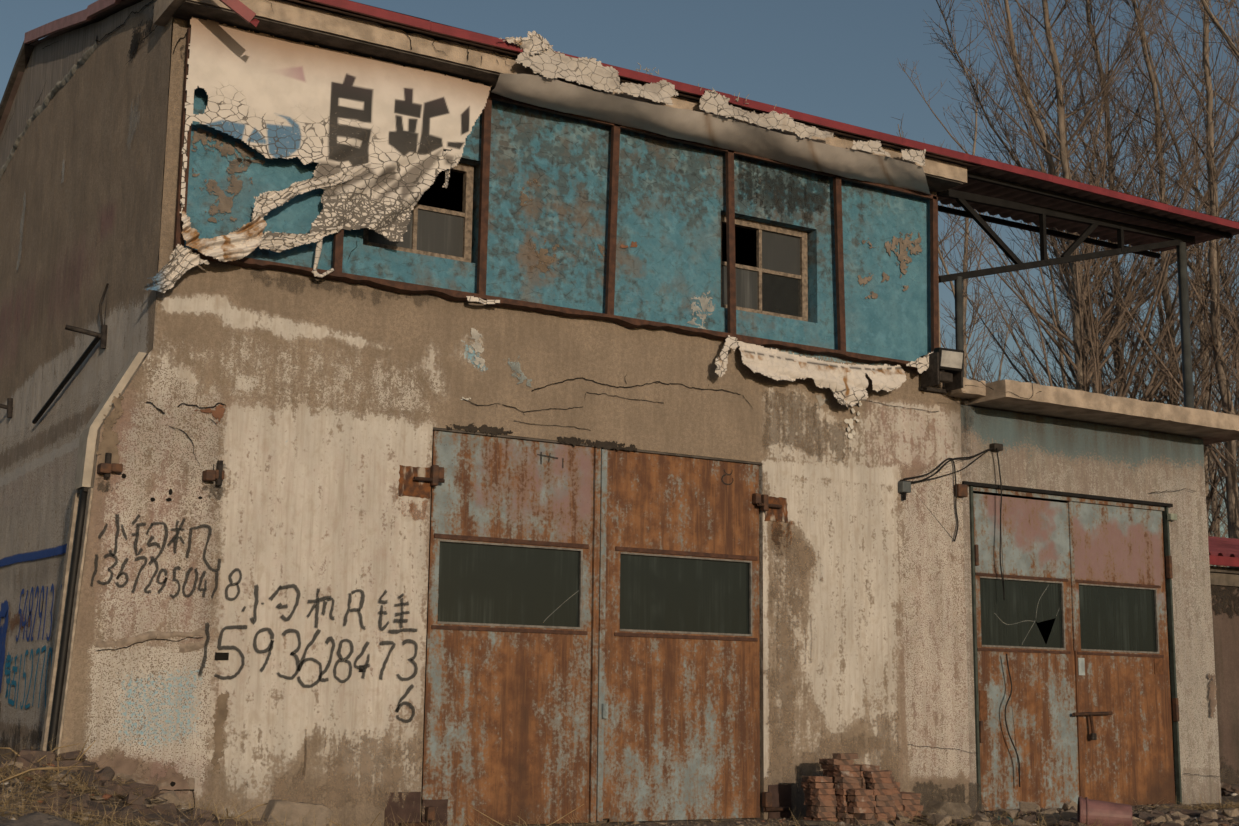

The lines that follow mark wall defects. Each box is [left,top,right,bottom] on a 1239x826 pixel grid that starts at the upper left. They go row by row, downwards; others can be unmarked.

crack [95,0,187,67]
peeling [191,128,265,230]
peeling [858,232,922,299]
crack [464,377,752,431]
leakage [763,522,901,792]
leakage [271,730,429,810]
leakage [913,781,986,811]